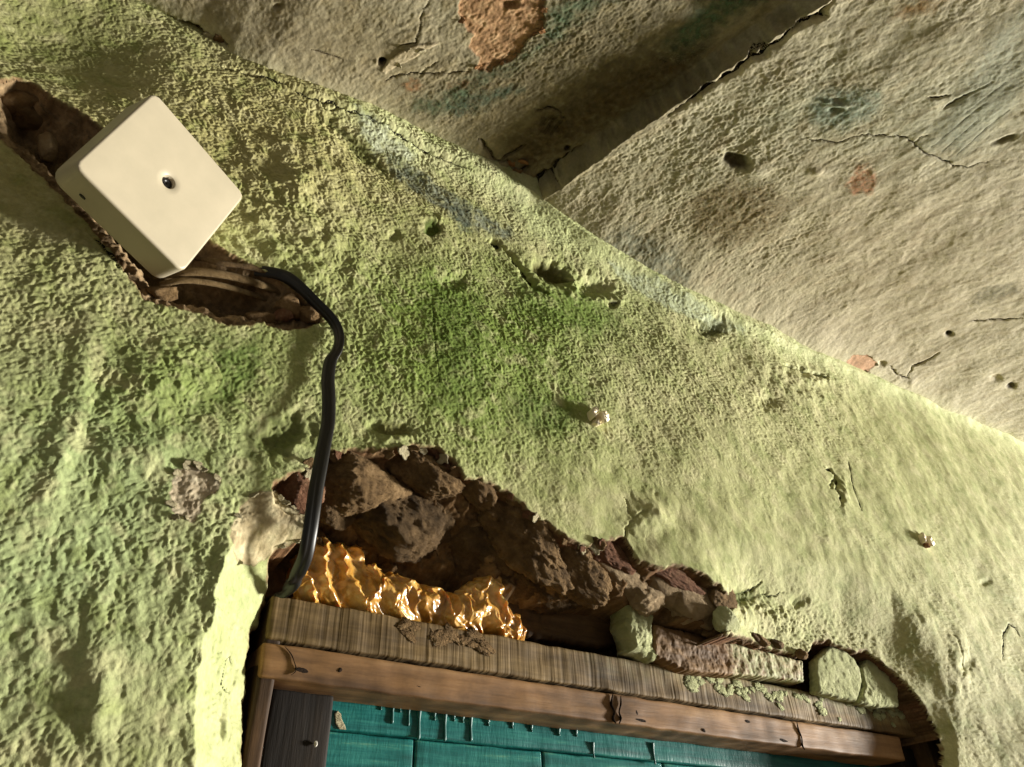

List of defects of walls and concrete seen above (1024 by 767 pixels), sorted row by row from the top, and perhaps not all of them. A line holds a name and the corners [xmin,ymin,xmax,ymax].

crack [386,62,469,81]
flaking render [458,0,548,73]
crack [679,5,826,107]
crack [929,82,991,108]
crack [481,139,575,183]
crack [801,133,980,168]
spalling [0,79,321,331]
flaking render [164,460,222,523]
flaking render [230,457,314,603]
spalling [316,445,939,747]